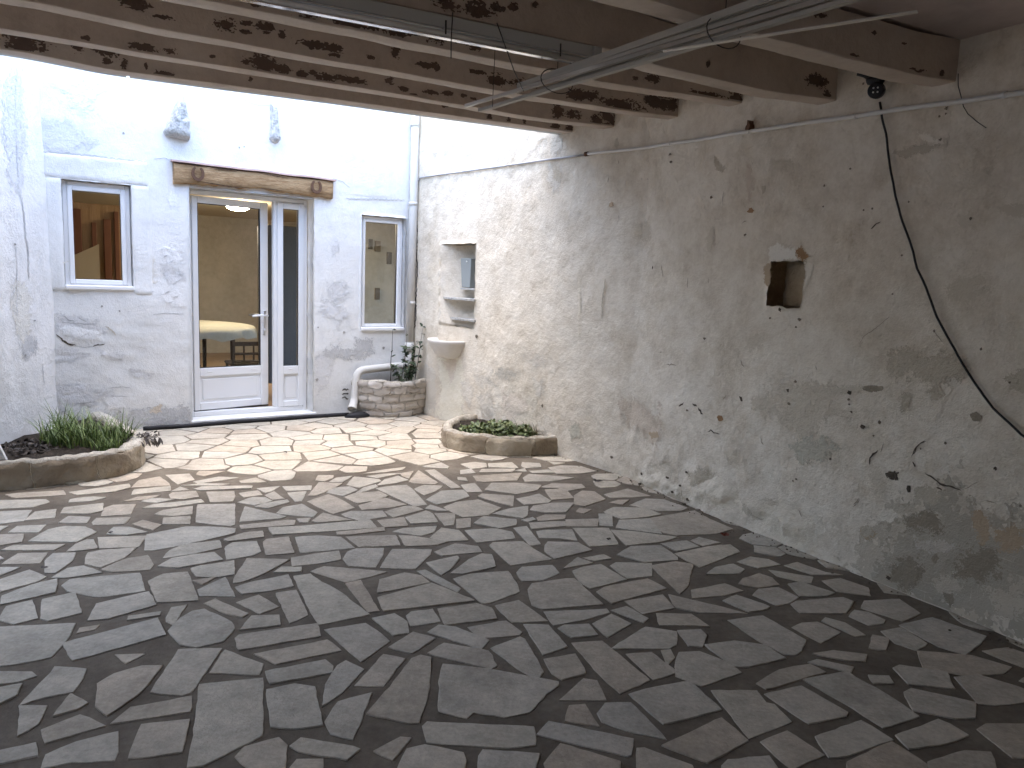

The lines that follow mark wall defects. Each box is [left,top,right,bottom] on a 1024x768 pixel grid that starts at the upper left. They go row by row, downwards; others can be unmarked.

peeling [118,0,176,21]
peeling [432,0,519,18]
peeling [1,34,52,53]
peeling [71,35,178,76]
peeling [212,17,344,58]
peeling [240,53,367,85]
peeling [298,12,481,60]
peeling [384,76,476,108]
peeling [689,88,743,101]
peeling [550,73,679,161]
peeling [763,242,814,291]
leakage [837,459,1024,640]